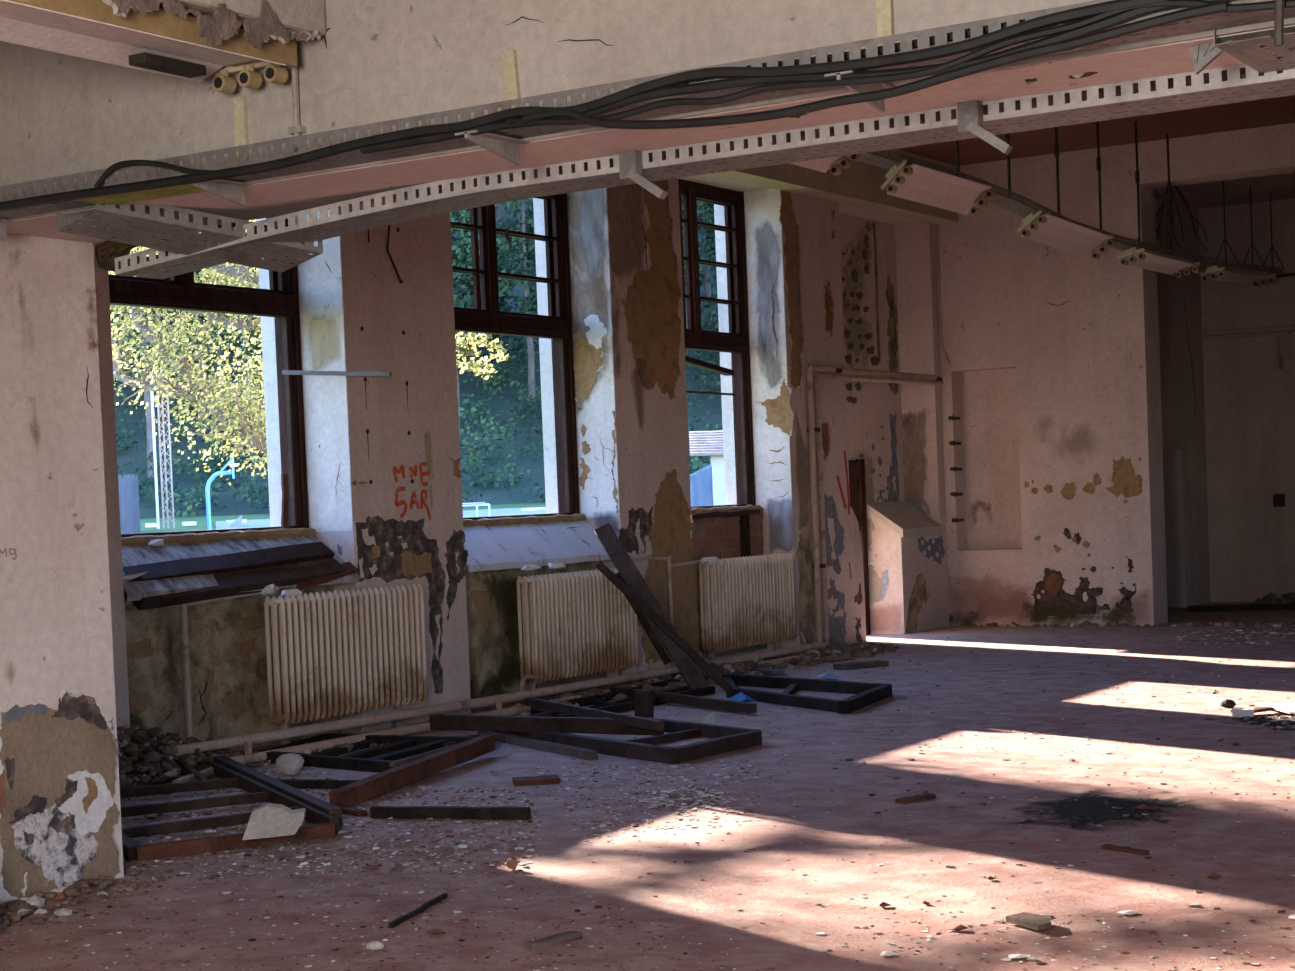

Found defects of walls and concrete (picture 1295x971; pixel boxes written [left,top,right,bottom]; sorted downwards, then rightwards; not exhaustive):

flaking render [102,0,321,48]
flaking render [573,314,608,403]
flaking render [621,179,682,401]
damp [756,222,782,387]
peeling [842,222,900,502]
peeling [337,516,607,699]
flaking render [611,411,767,659]
flaking render [796,492,884,646]
flaking render [904,535,945,633]
peeling [1029,528,1137,622]
flaking render [1024,456,1143,504]
flaking render [0,586,342,905]